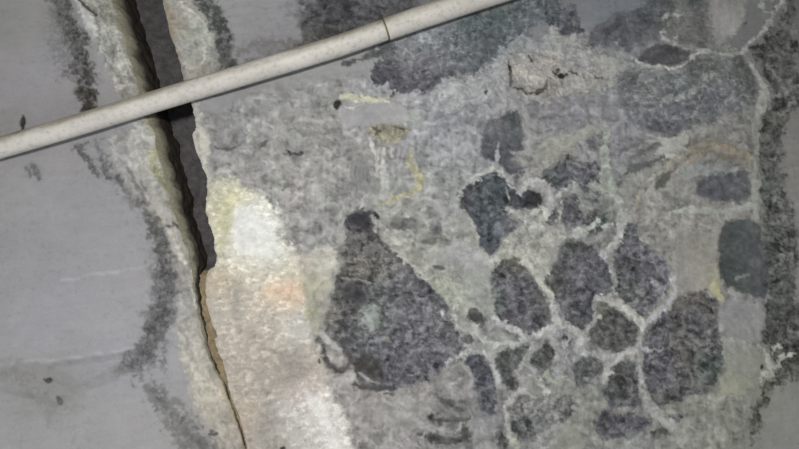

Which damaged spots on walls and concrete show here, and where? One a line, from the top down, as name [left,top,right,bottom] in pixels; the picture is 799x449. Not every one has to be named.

damp [32,0,107,113]
crack [113,0,184,94]
spalling [192,100,213,173]
peeling [332,91,429,131]
spalling [499,40,606,107]
damp [0,133,227,449]
spalling [104,120,244,449]
crack [147,102,247,449]
damp [188,0,799,449]